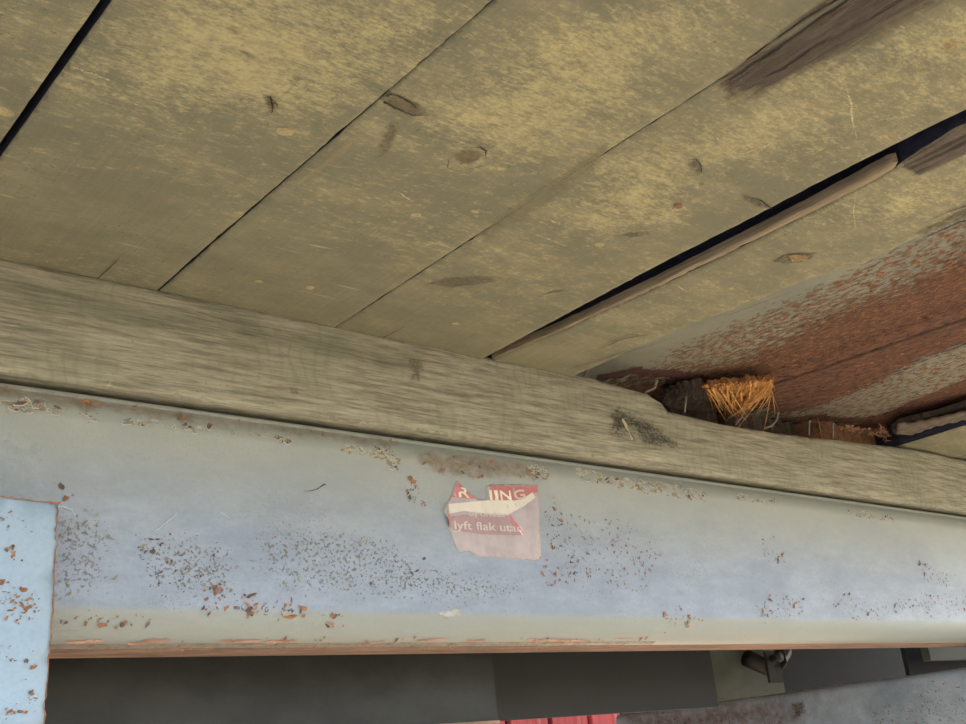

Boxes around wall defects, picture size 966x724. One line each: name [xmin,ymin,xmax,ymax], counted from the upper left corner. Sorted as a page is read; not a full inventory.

corrosion [596,222,966,431]
corrosion [0,482,344,724]
corrosion [135,520,525,621]
corrosion [540,497,661,591]
corrosion [823,560,966,620]